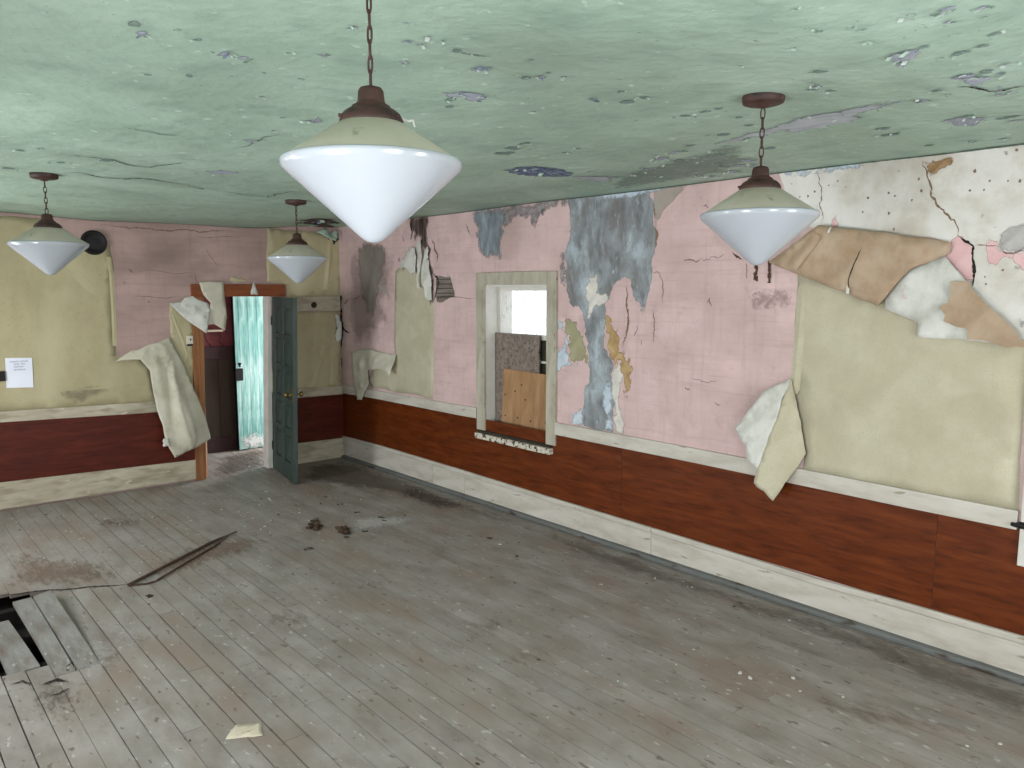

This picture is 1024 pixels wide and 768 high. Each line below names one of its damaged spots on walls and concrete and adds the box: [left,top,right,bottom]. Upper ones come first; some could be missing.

crack [68,154,295,198]
peeling [170,281,227,333]
damp [344,243,386,312]
peeling [506,166,574,177]
peeling [557,145,702,432]
crack [408,144,1024,284]
peeling [704,90,951,178]
spalling [769,138,1024,348]
peeling [116,338,211,458]
peeling [351,349,396,400]
peeling [735,379,806,501]